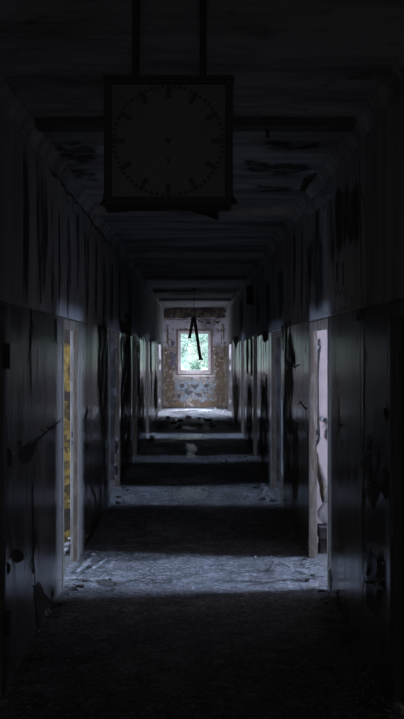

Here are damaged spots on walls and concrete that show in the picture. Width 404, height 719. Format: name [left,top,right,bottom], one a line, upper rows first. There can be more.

damp [23,158,132,474]
peeling [150,339,216,411]
damp [278,270,299,515]